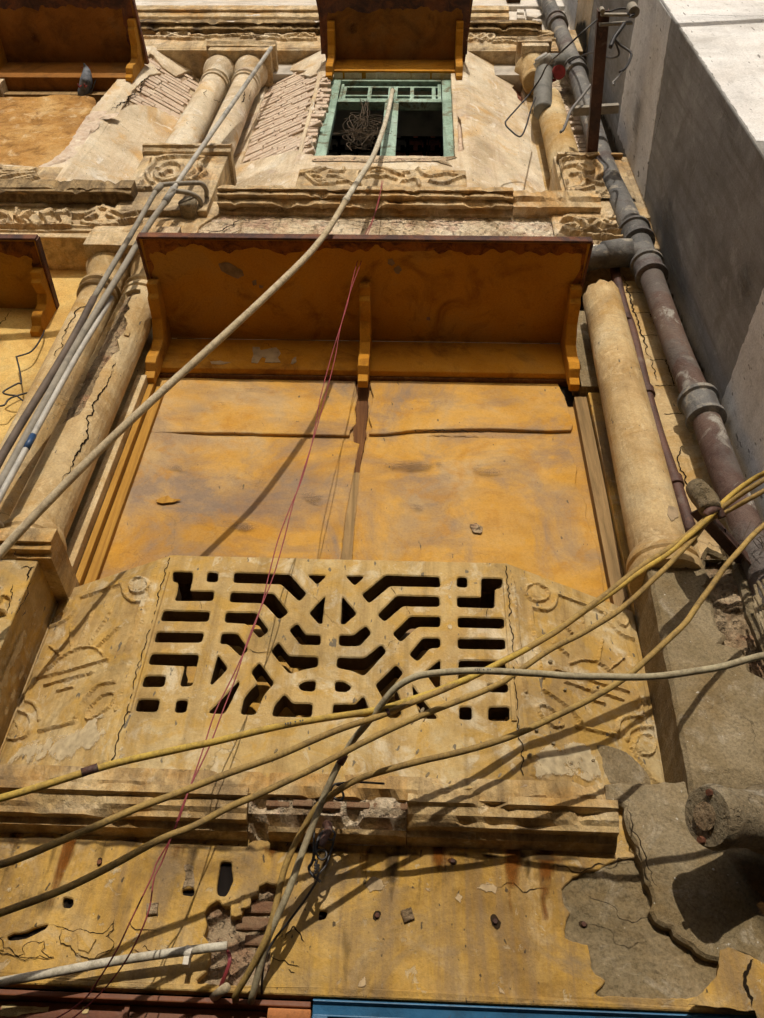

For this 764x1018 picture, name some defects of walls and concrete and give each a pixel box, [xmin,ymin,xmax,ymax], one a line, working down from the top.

crack [112,75,150,108]
crack [54,306,85,356]
crack [623,276,657,378]
crack [62,362,116,480]
crack [677,445,687,485]
flaking render [700,553,764,678]
peeling [536,742,651,785]
corrosion [506,849,520,884]
corrosion [540,850,553,916]
flaking render [198,863,281,986]
flaking render [562,859,764,1018]